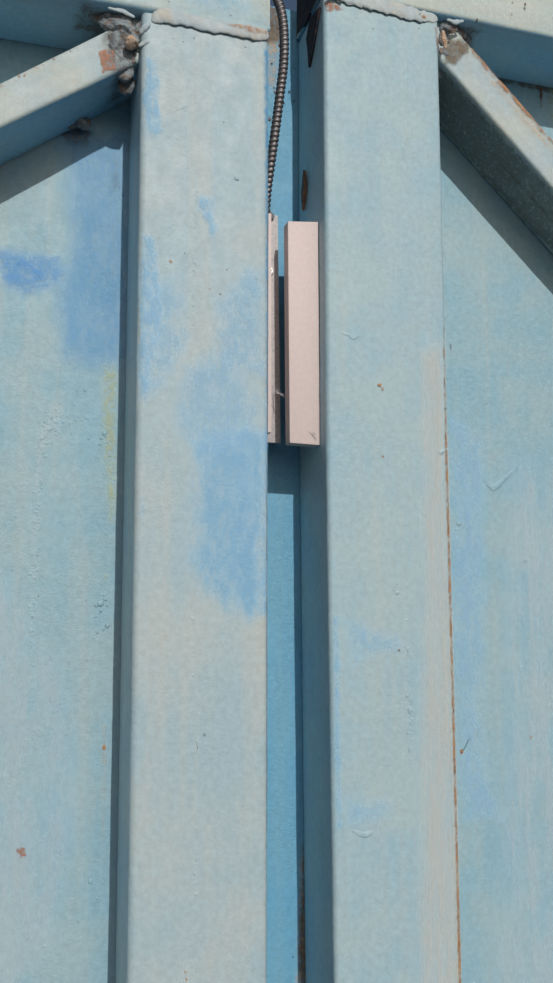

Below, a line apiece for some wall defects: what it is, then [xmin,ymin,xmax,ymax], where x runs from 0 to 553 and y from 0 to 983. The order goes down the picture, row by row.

peeling [108,7,150,47]
peeling [441,18,464,49]